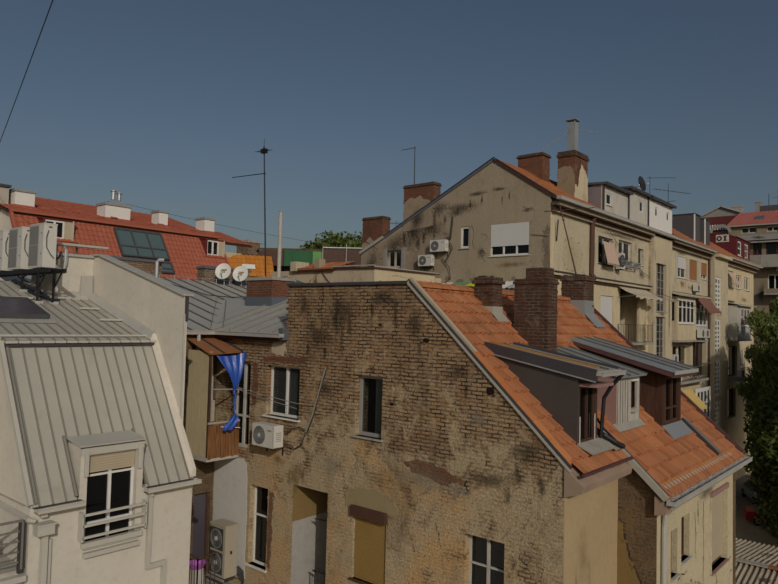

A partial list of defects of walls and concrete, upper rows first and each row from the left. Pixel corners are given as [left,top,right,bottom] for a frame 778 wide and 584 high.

spalling [398,459,468,487]